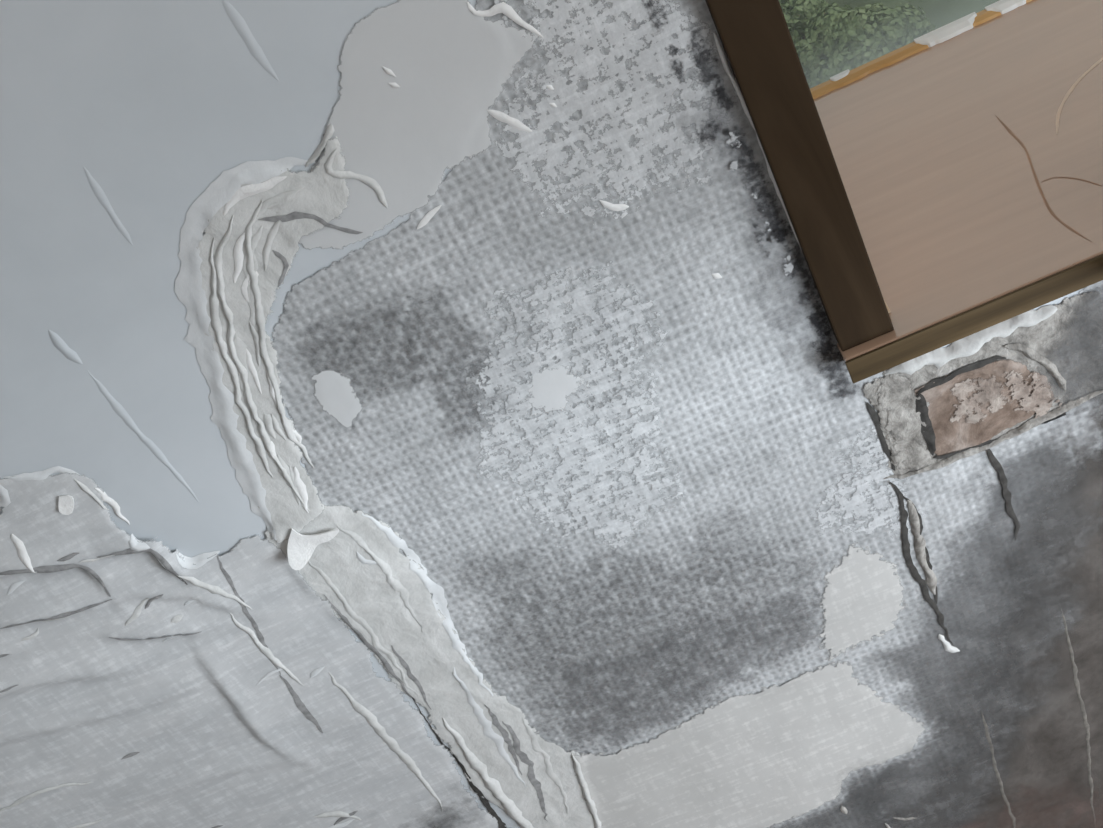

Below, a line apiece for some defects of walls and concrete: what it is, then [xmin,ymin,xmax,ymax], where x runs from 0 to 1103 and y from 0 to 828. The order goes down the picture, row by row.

leakage [467,2,544,38]
leakage [487,110,532,132]
leakage [599,200,629,211]
leakage [670,29,733,110]
leakage [700,124,855,397]
peeling [0,466,594,828]
crack [324,595,534,828]
flaking render [174,0,1002,828]
crack [866,402,960,653]
leakage [786,393,1103,828]
flaking render [862,280,1103,496]
crack [987,449,1020,541]